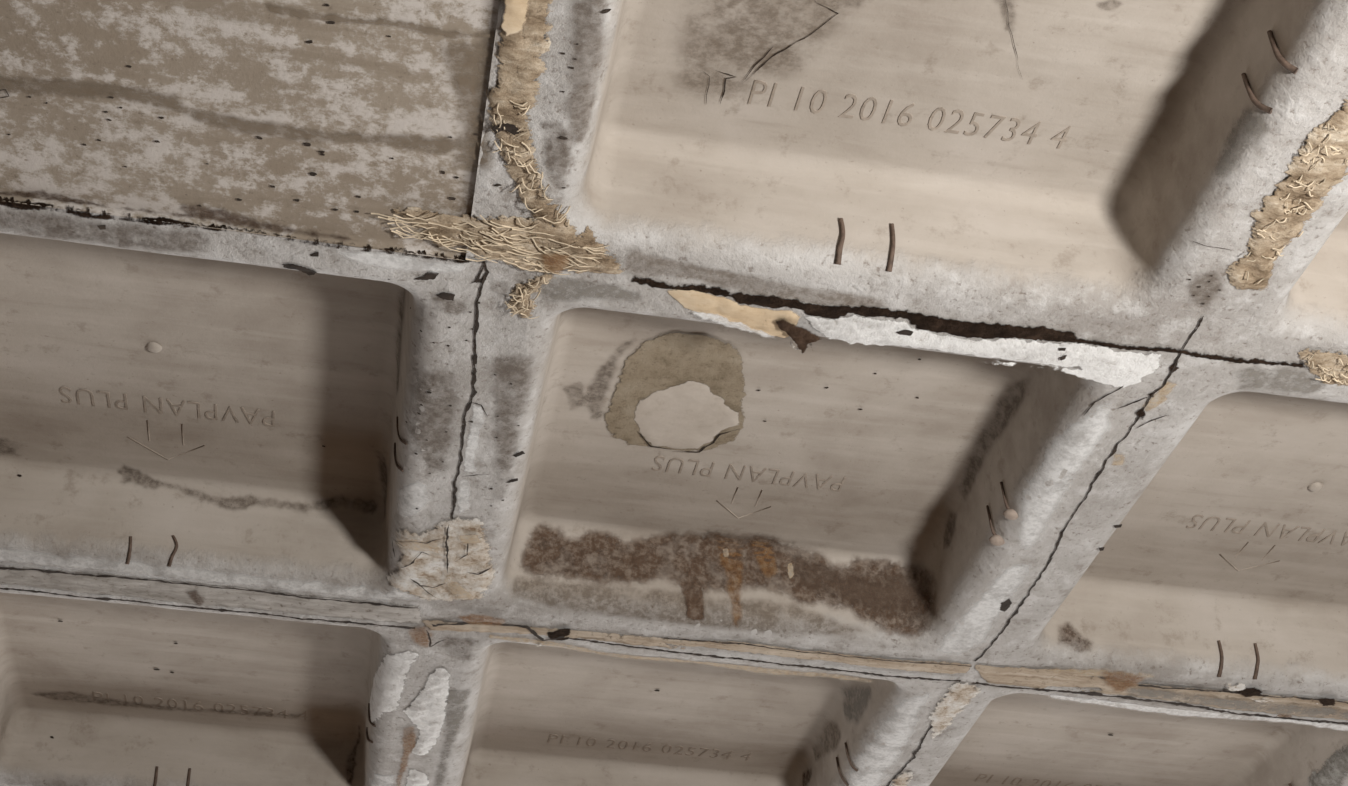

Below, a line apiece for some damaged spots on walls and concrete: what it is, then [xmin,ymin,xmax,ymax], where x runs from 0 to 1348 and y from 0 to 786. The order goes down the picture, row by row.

peeling [502,0,529,36]
spalling [491,123,520,135]
spalling [414,271,455,301]
crack [451,262,489,519]
peeling [604,290,820,453]
damp [0,463,497,601]
damp [514,525,932,636]
crack [887,316,1204,786]